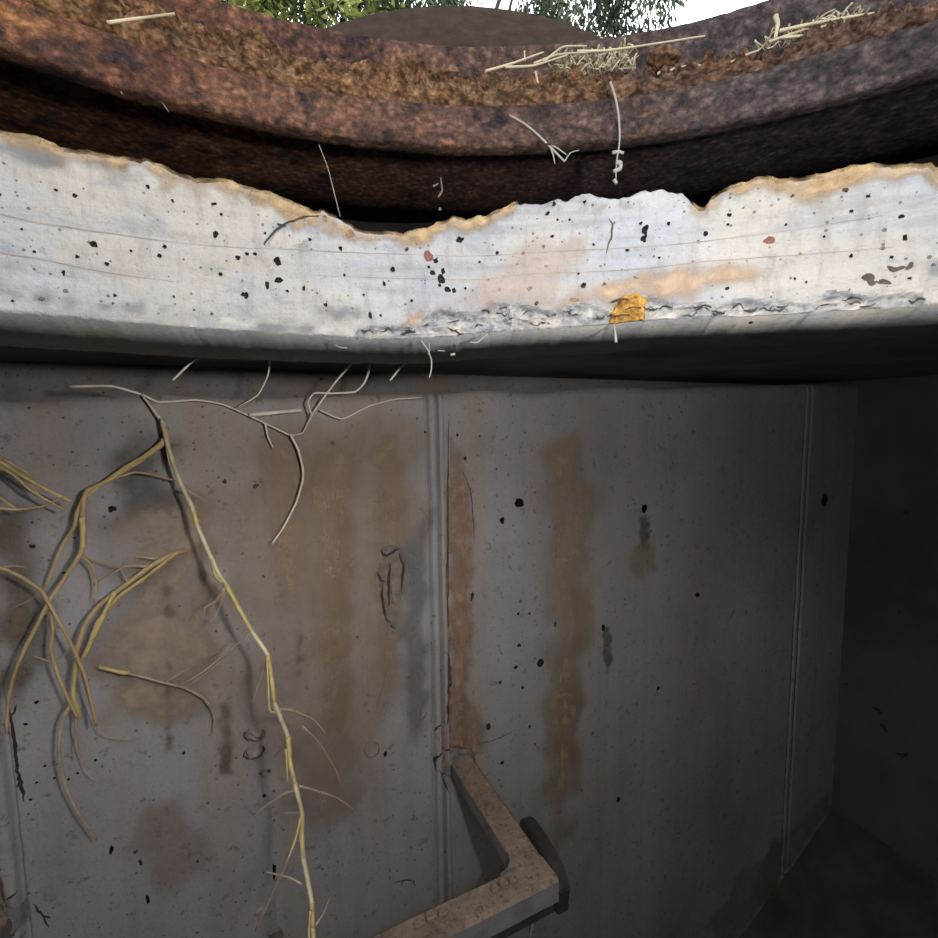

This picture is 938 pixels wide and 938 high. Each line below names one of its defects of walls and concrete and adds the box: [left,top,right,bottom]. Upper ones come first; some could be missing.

spalling [353,300,612,339]
rust [597,266,757,324]
crack [9,705,25,802]
crack [0,869,51,927]